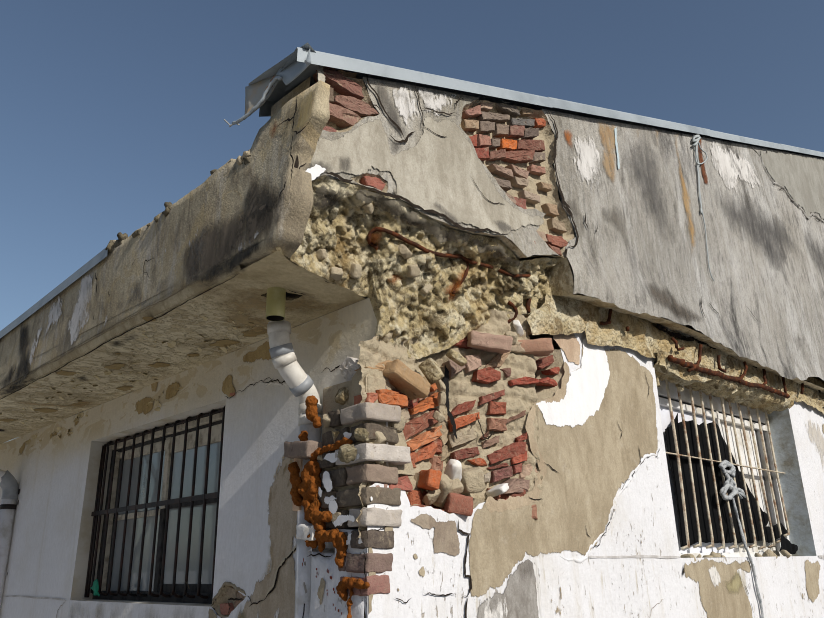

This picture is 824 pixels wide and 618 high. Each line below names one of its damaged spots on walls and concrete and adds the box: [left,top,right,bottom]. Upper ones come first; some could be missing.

flaking render [313,66,456,134]
spalling [105,202,172,252]
damp [184,171,279,286]
damp [1,296,62,395]
damp [68,274,93,345]
peeling [141,311,271,363]
flaking render [208,100,662,618]
peeling [805,420,824,472]
crack [248,546,332,606]
peeling [680,549,791,618]